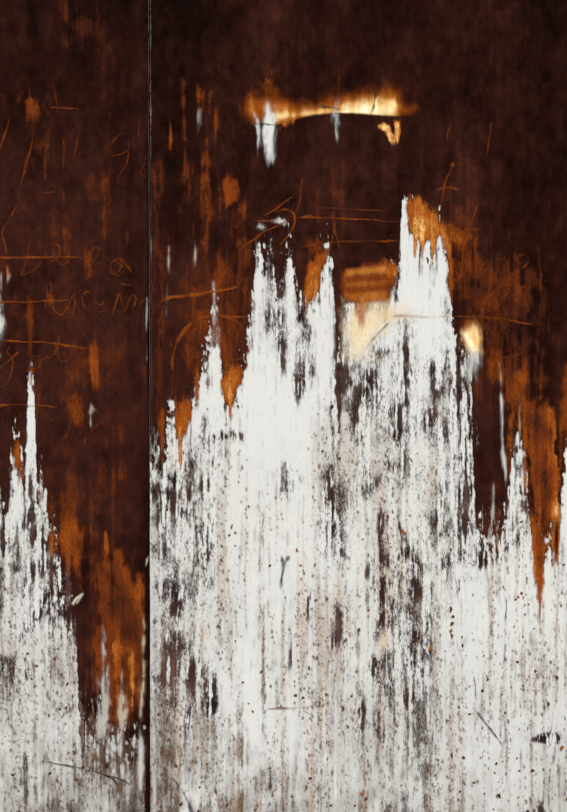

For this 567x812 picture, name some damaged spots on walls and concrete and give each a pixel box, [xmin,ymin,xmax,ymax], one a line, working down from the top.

rust [244,73,413,143]
rust [146,80,252,466]
peeling [198,401,243,449]
peeling [265,304,287,374]
peeling [292,357,315,404]
rust [340,258,397,349]
peeling [376,319,412,485]
peeling [440,415,450,444]
rust [406,194,567,620]
peeling [182,453,196,504]
rust [36,490,172,812]
peeling [119,629,155,789]